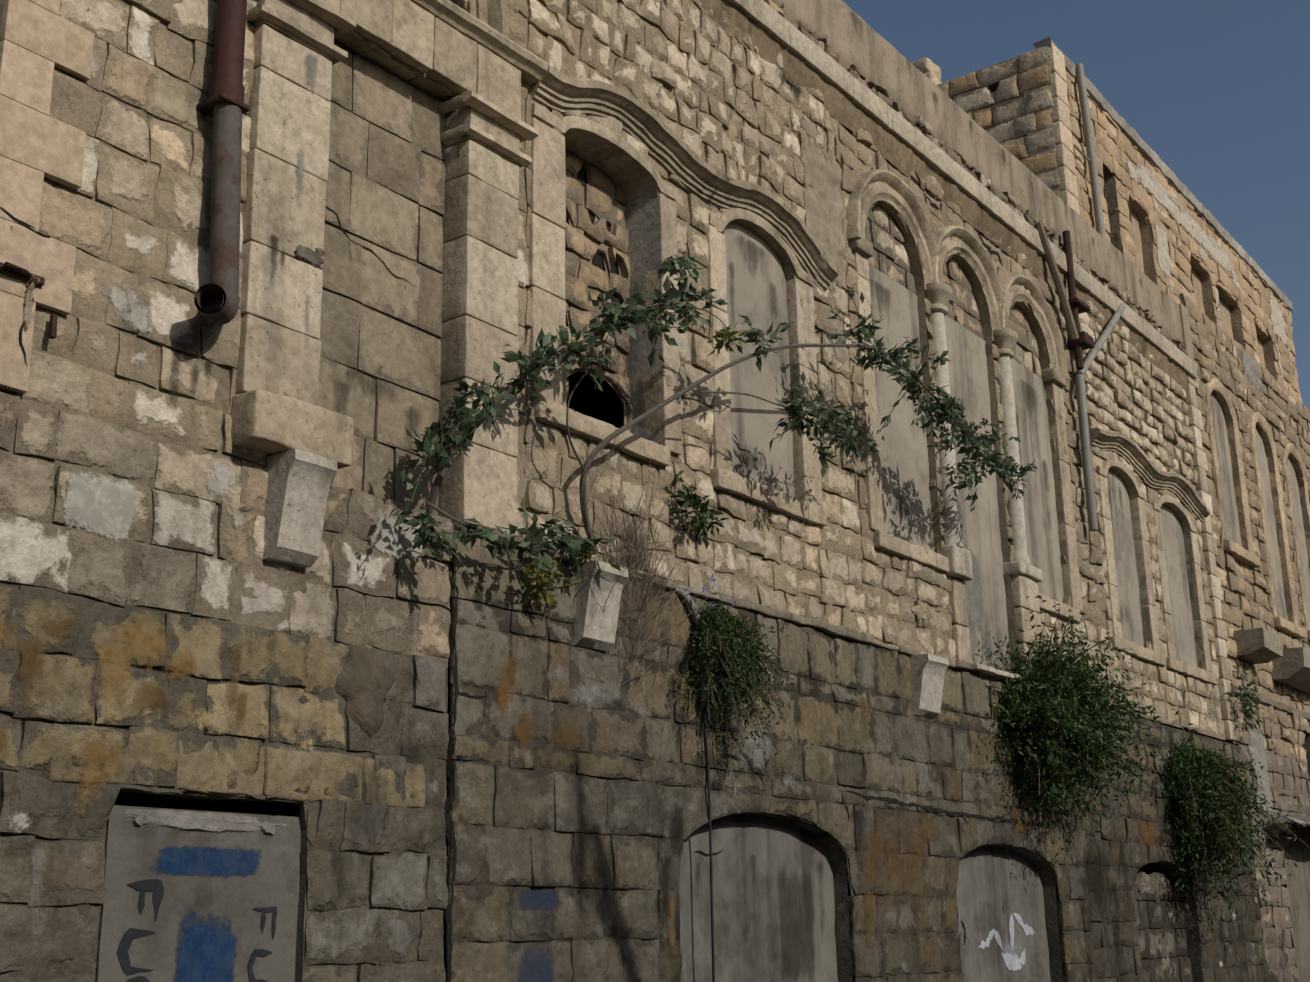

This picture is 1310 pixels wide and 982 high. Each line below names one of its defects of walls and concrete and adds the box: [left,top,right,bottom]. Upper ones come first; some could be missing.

crack [325,205,416,287]